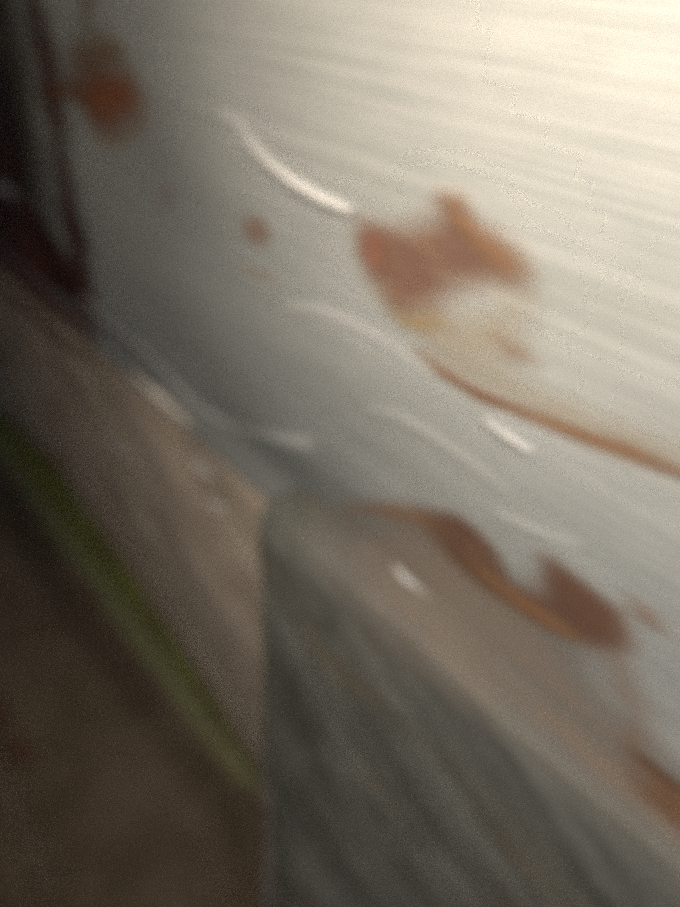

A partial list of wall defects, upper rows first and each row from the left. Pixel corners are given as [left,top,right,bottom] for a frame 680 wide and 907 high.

corrosion [0,0,136,340]
corrosion [364,205,511,326]
corrosion [433,364,650,461]
corrosion [377,508,621,642]
corrosion [602,753,680,836]